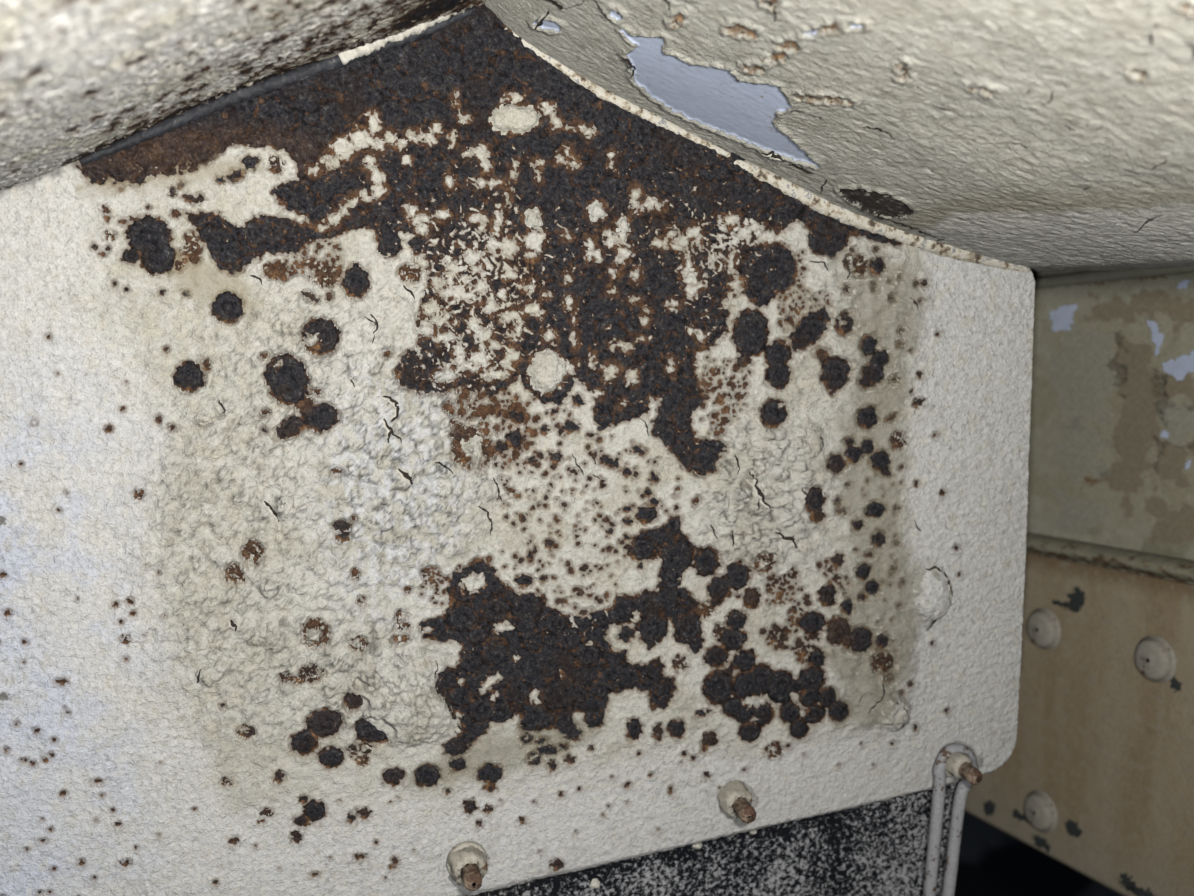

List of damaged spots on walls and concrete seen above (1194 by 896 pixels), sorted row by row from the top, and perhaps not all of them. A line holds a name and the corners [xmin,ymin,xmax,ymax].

peeling [532,20,560,32]
peeling [610,11,819,167]
rust [62,0,927,827]
peeling [1047,279,1194,546]
peeling [1052,587,1086,613]
rust [290,796,326,843]
peeling [1118,874,1154,896]